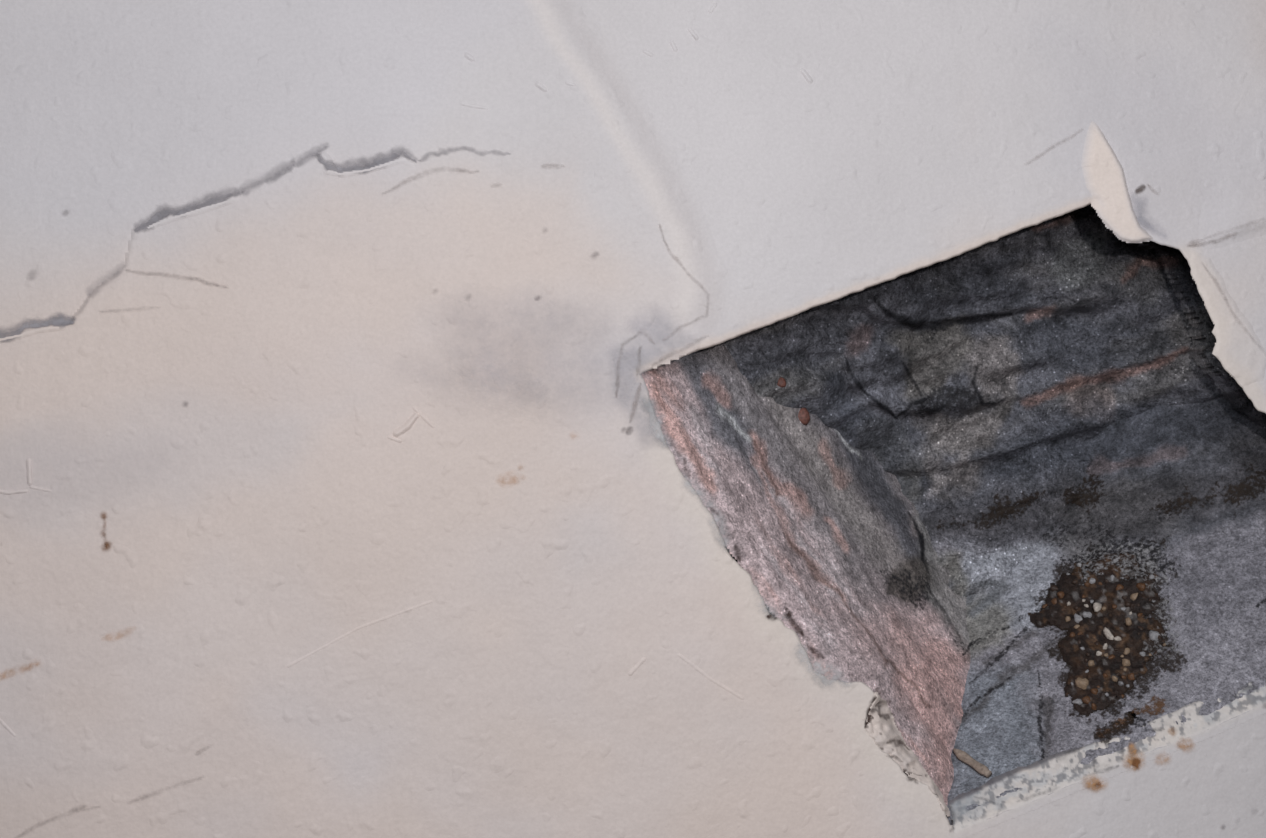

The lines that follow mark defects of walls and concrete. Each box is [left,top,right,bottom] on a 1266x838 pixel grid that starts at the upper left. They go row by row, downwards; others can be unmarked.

crack [318,150,416,178]
crack [135,192,240,233]
crack [0,314,74,343]
peeling [1190,251,1266,386]
spalling [766,607,846,684]
spalling [862,682,1266,838]